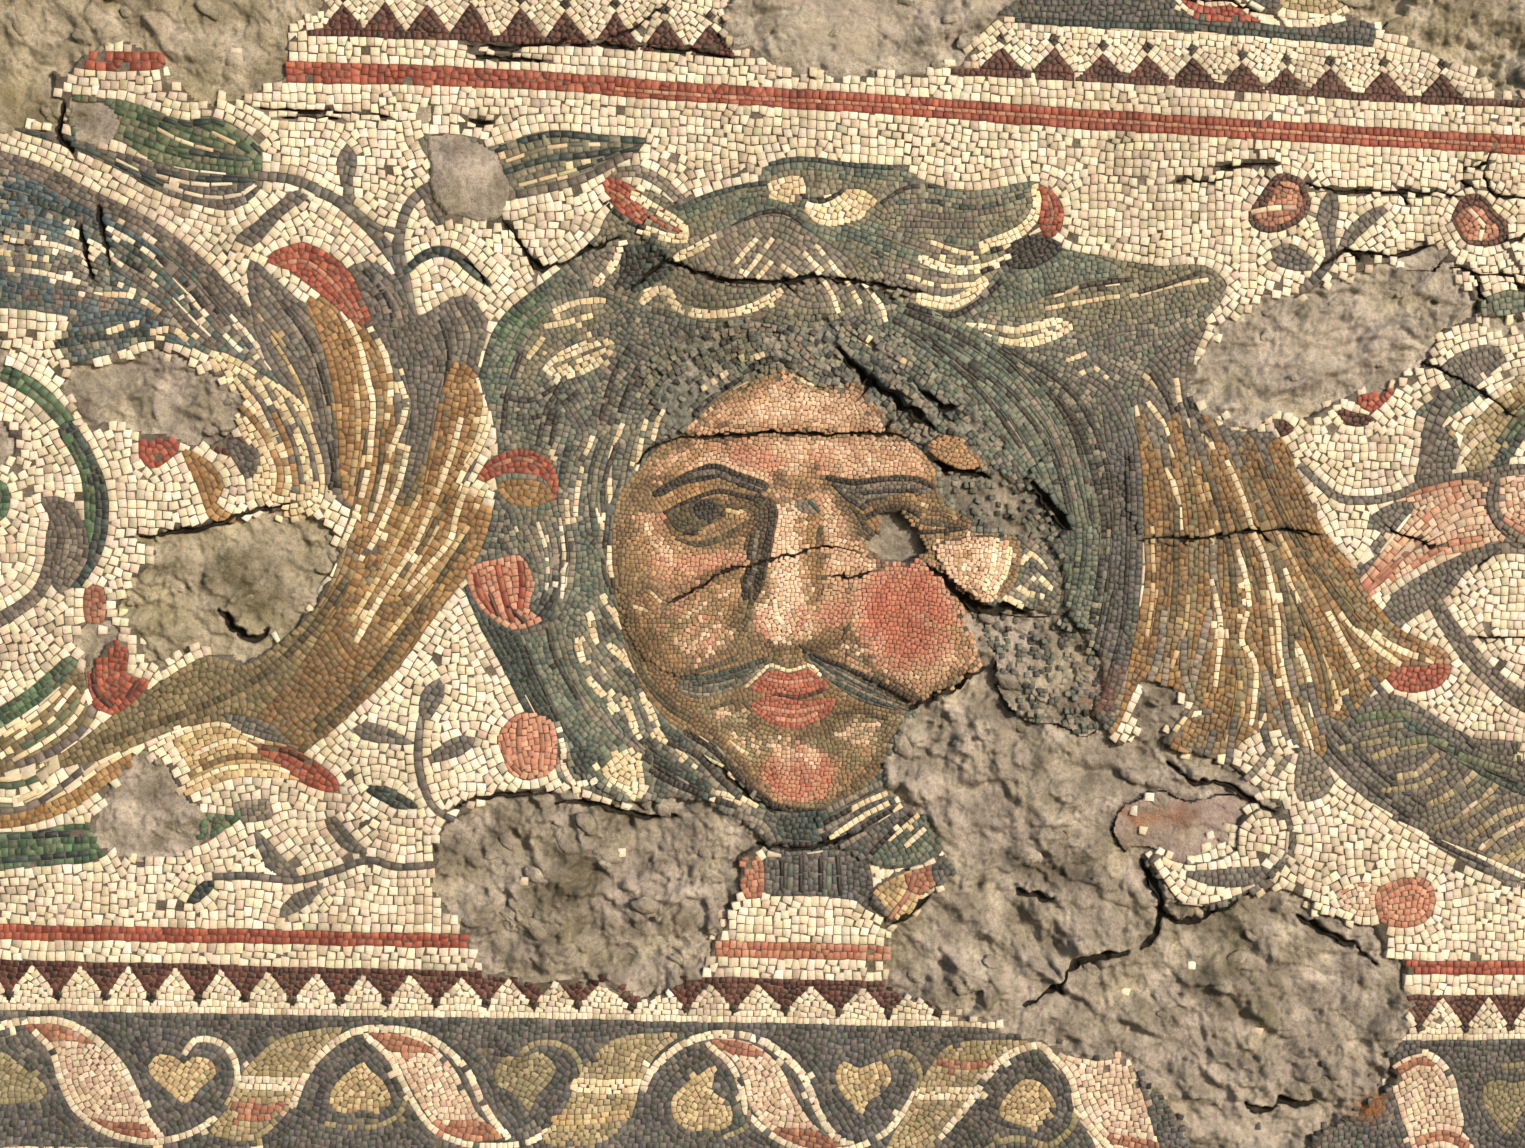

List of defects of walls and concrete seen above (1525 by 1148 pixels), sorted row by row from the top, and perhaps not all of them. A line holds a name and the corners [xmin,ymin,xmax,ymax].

spalling [0,0,324,146]
spalling [719,0,1014,78]
spalling [1338,0,1525,96]
crack [1177,153,1525,302]
spalling [1185,242,1525,431]
crack [1421,361,1513,416]
spalling [74,510,340,672]
crack [668,545,869,603]
crack [927,565,1024,616]
crack [1138,527,1319,541]
spalling [431,789,763,998]
spalling [881,605,1412,1148]